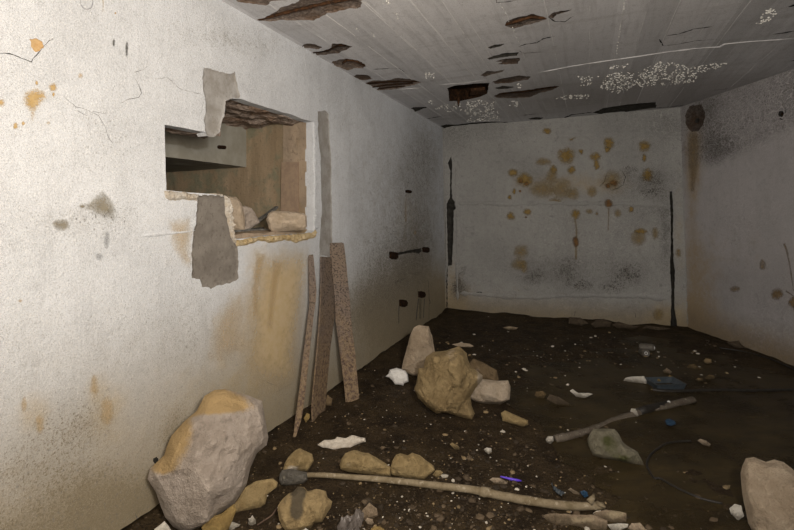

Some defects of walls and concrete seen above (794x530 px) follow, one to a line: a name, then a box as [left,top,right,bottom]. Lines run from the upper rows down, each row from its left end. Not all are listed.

spalling [236,0,362,21]
spalling [505,11,568,28]
spalling [302,43,420,90]
spalling [480,44,559,98]
rust [26,81,56,109]
flaking render [164,191,199,201]
flaking render [224,122,318,246]
rust [508,138,614,202]